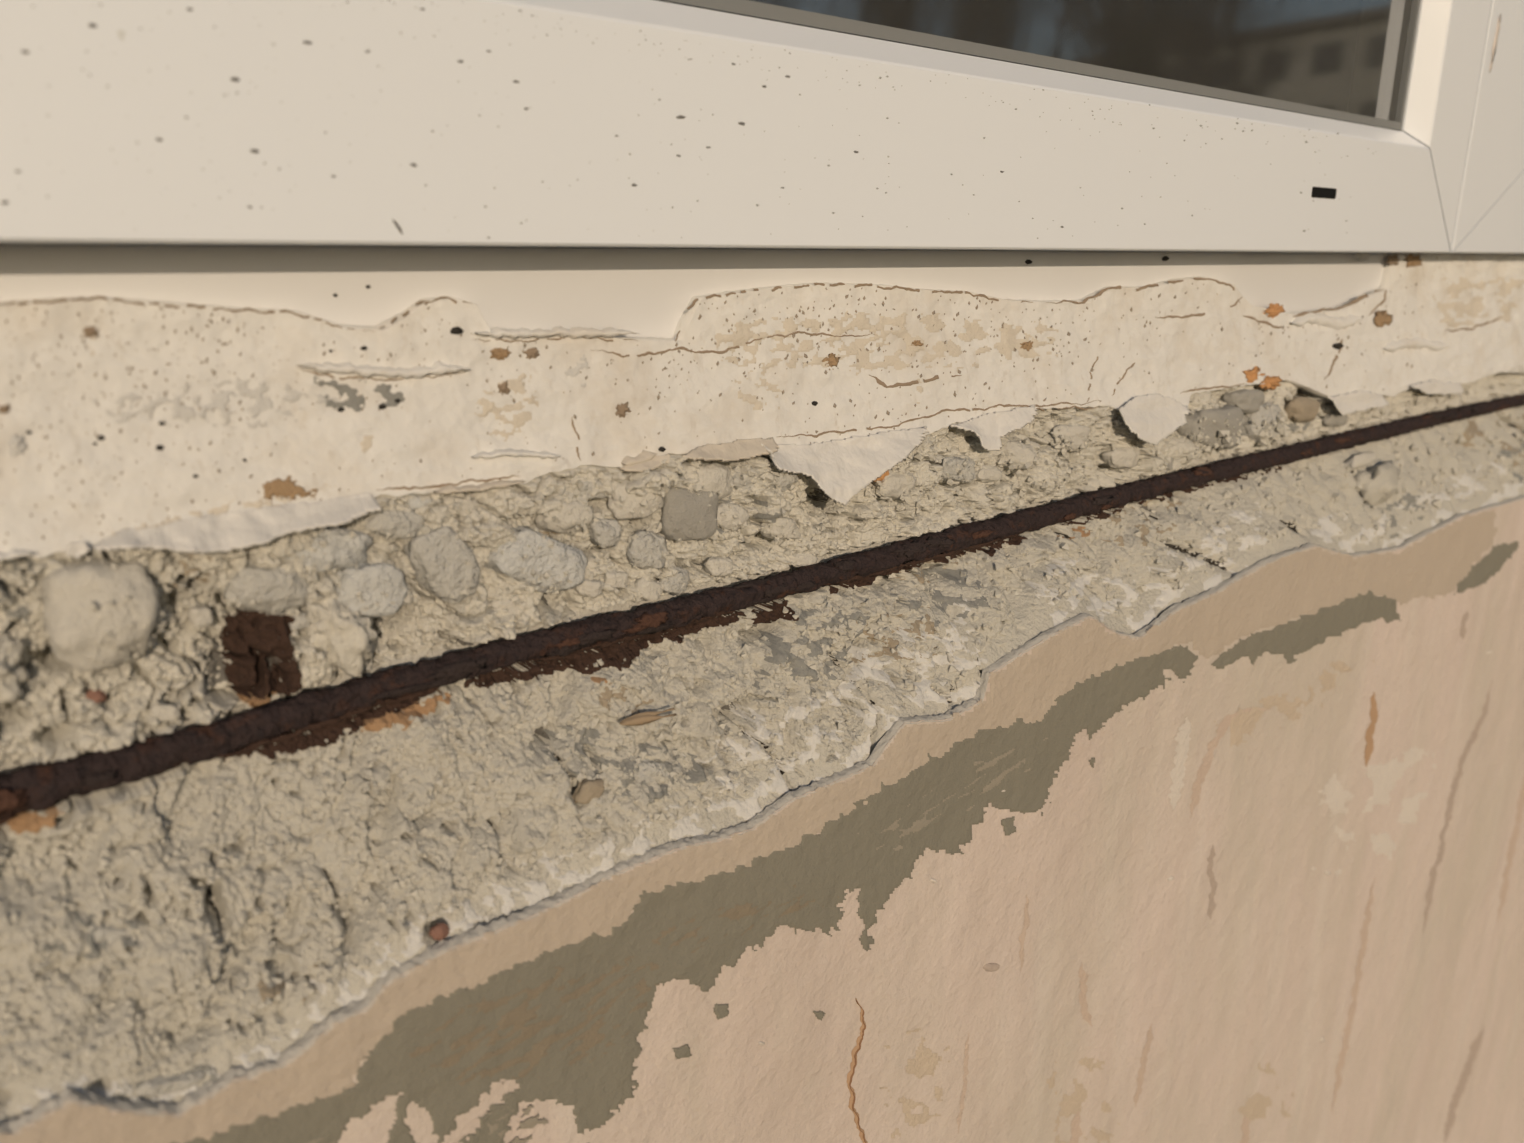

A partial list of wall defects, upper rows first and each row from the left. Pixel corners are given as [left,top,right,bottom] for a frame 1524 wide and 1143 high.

rust [1057,466,1282,539]
rust [829,535,1028,594]
rust [216,598,799,762]
spalling [0,373,1524,1143]
rust [1364,692,1378,767]
rust [7,806,65,835]
crack [849,1000,866,1143]